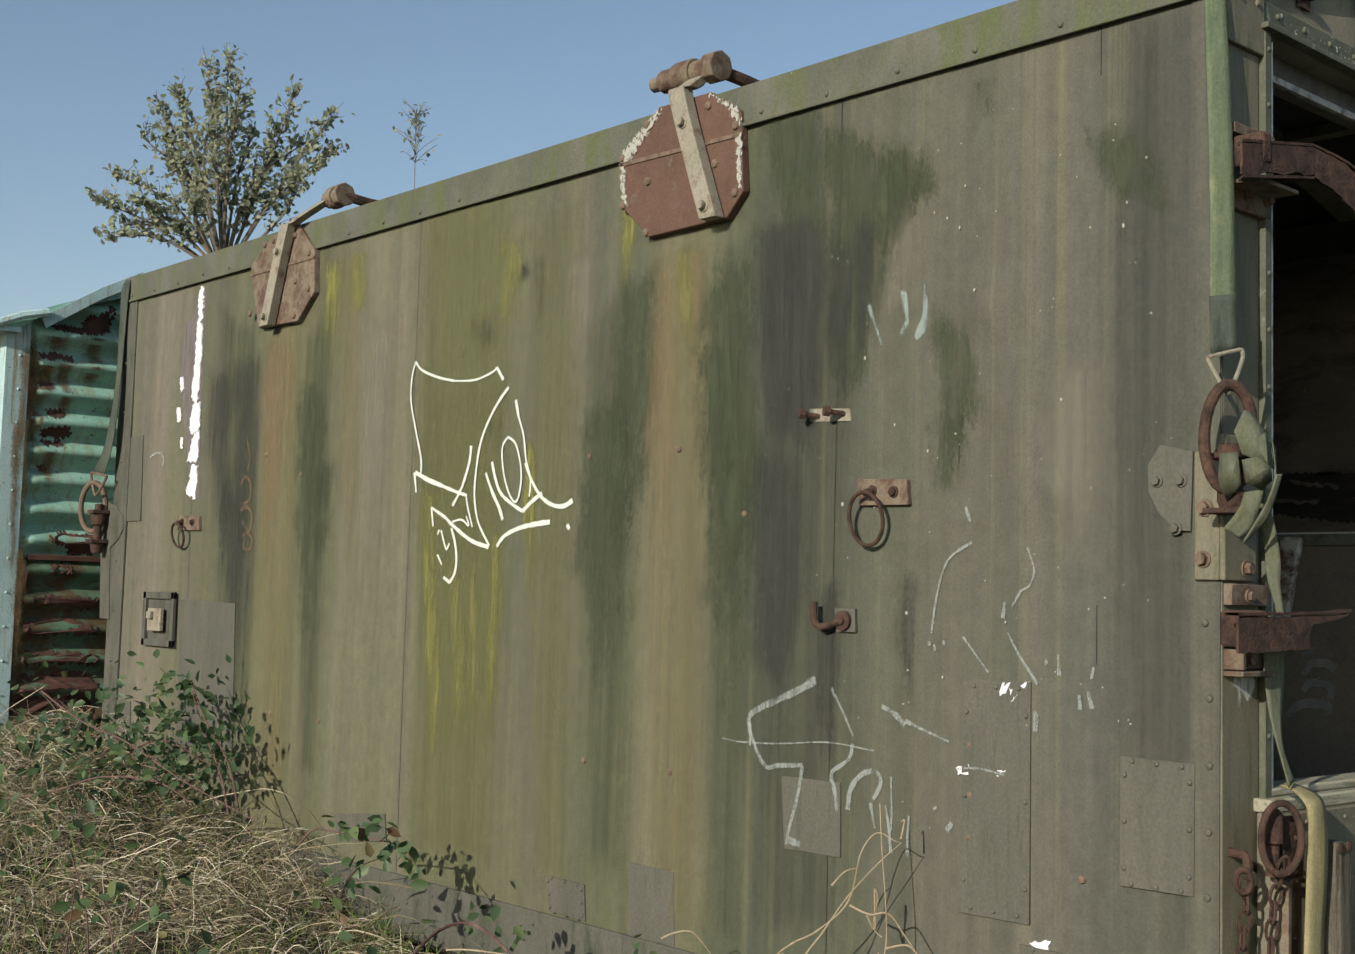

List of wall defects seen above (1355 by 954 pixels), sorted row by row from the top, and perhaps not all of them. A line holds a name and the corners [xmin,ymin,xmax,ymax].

leakage [770,115,929,387]
rust [8,305,117,727]